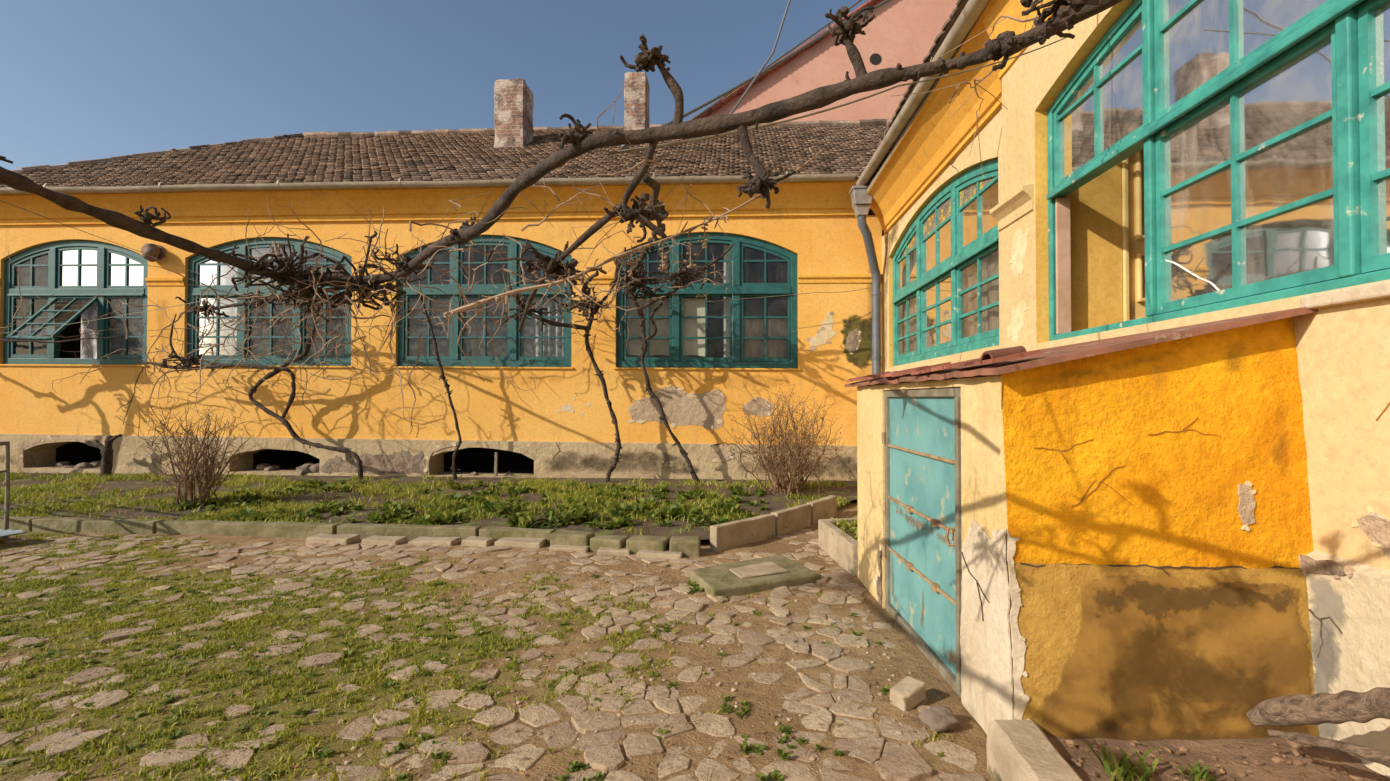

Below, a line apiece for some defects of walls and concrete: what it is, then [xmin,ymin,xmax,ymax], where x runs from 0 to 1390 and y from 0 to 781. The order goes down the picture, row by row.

peeling [806,311,862,354]
spalling [627,385,774,463]
crack [1149,418,1219,436]
crack [1035,439,1134,507]
spalling [1238,481,1256,531]
peeling [960,521,1030,735]
water stain [1042,573,1345,741]